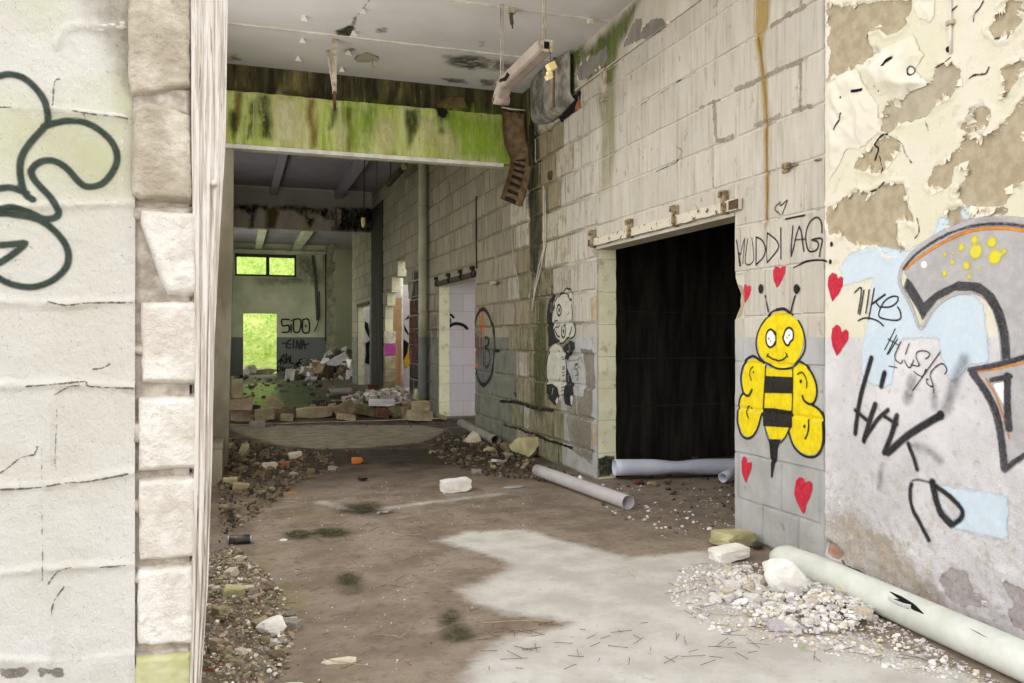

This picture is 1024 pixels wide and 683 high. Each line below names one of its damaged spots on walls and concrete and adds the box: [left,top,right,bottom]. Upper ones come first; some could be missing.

peeling [355,53,379,63]
damp [383,79,418,142]
damp [452,57,512,85]
peeling [558,44,607,122]
peeling [623,18,671,47]
rust [756,0,769,199]
peeling [826,0,912,83]
peeling [826,60,963,254]
peeling [927,57,1024,226]
peeling [989,0,1024,42]
crack [0,363,134,491]
crack [500,391,573,463]